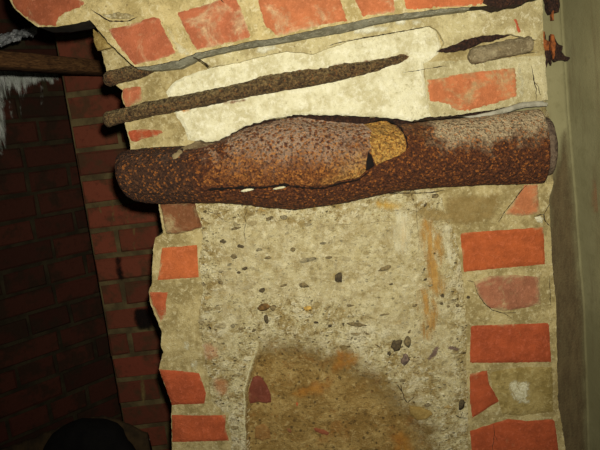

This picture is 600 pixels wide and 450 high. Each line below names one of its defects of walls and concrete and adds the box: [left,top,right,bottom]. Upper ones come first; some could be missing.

spalling [438,34,510,53]
corrosion [242,54,409,84]
spalling [122,87,142,107]
peeling [465,101,548,118]
spalling [128,129,163,142]
corrosion [192,117,406,187]
corrosion [422,219,443,337]